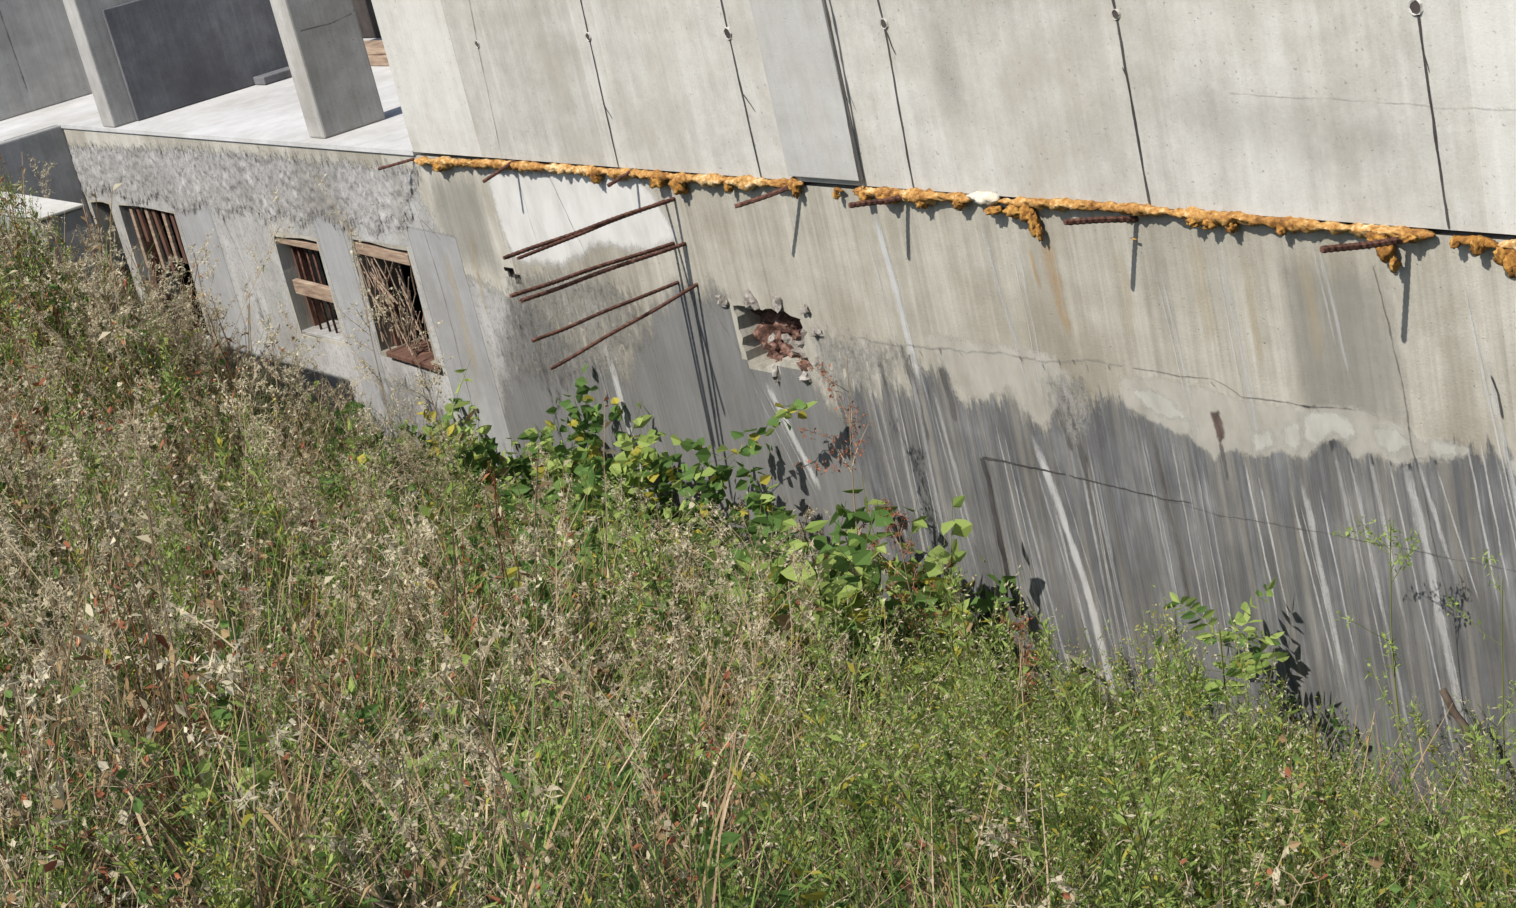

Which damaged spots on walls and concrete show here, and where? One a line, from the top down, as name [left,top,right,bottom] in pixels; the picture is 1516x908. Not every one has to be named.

spalling [503,197,676,260]
spalling [509,242,687,303]
spalling [531,281,698,370]
spalling [714,289,906,392]
crack [980,272,1508,596]
water stain [503,221,1516,853]